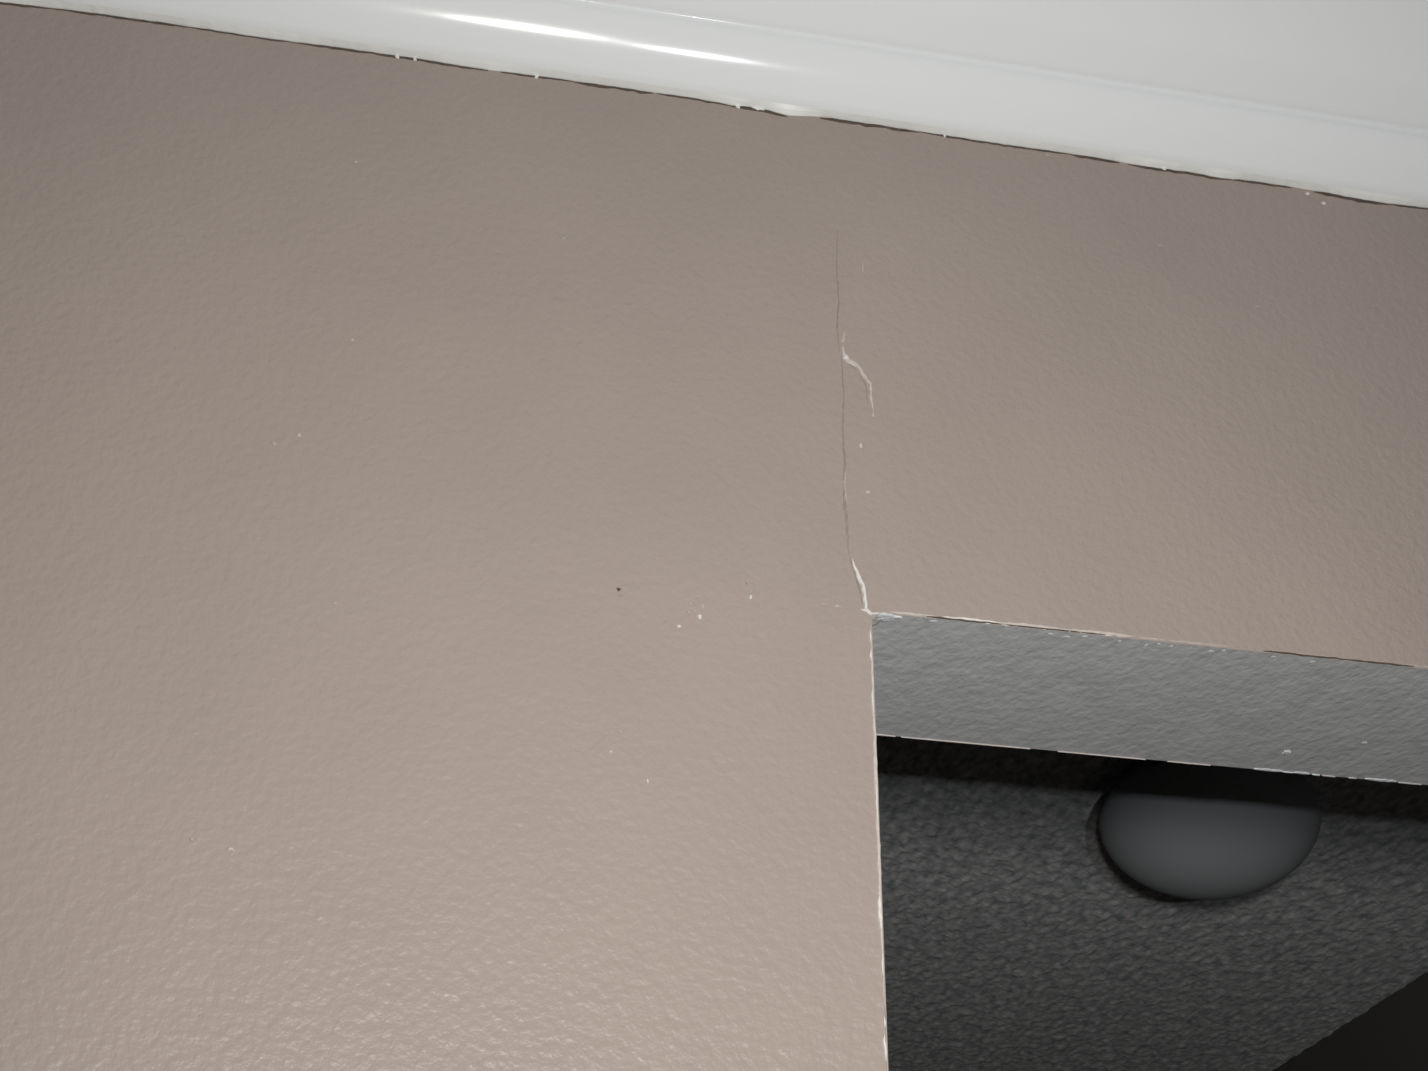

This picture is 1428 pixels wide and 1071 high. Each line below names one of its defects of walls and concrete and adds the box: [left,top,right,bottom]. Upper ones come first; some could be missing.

crack [836,230,875,609]